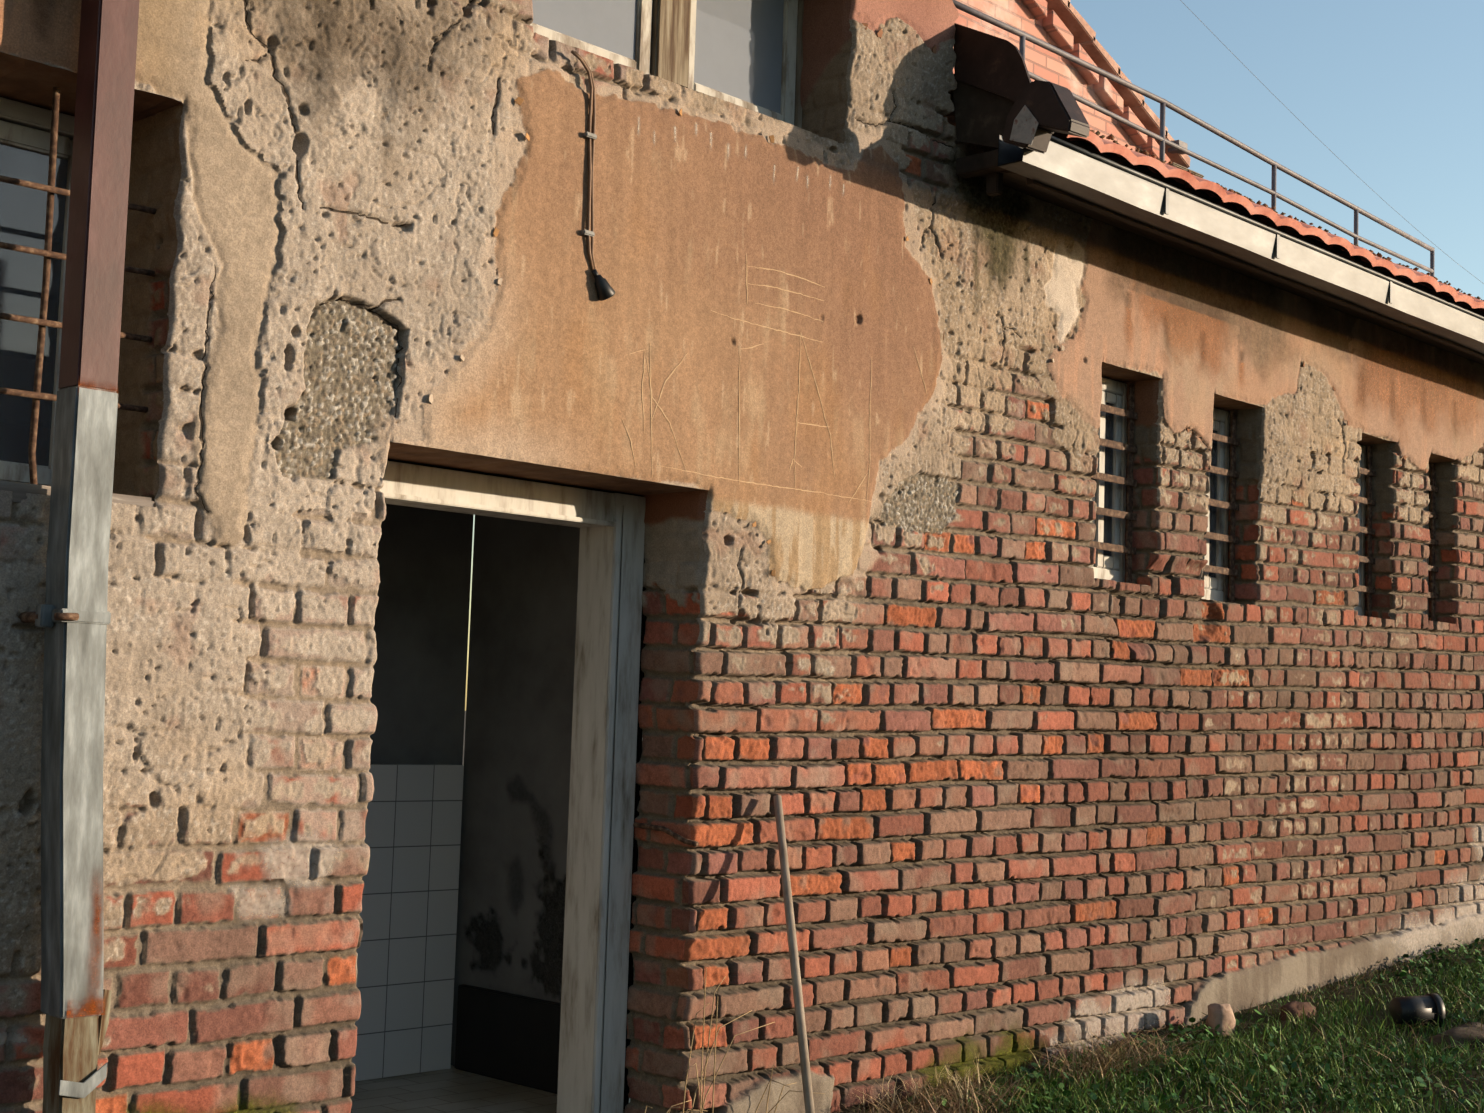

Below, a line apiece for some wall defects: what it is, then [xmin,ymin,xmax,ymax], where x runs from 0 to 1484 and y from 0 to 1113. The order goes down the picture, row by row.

crack [244,0,412,227]
leakage [951,157,1028,284]
flaking render [1260,360,1364,513]
flaking render [699,499,859,641]
spalling [1105,557,1231,661]
spalling [687,793,754,848]
spalling [699,733,770,761]
spalling [810,735,1040,863]
rust [66,996,106,1018]
rust [93,894,101,973]
leakage [466,850,566,996]
spalling [682,905,751,989]